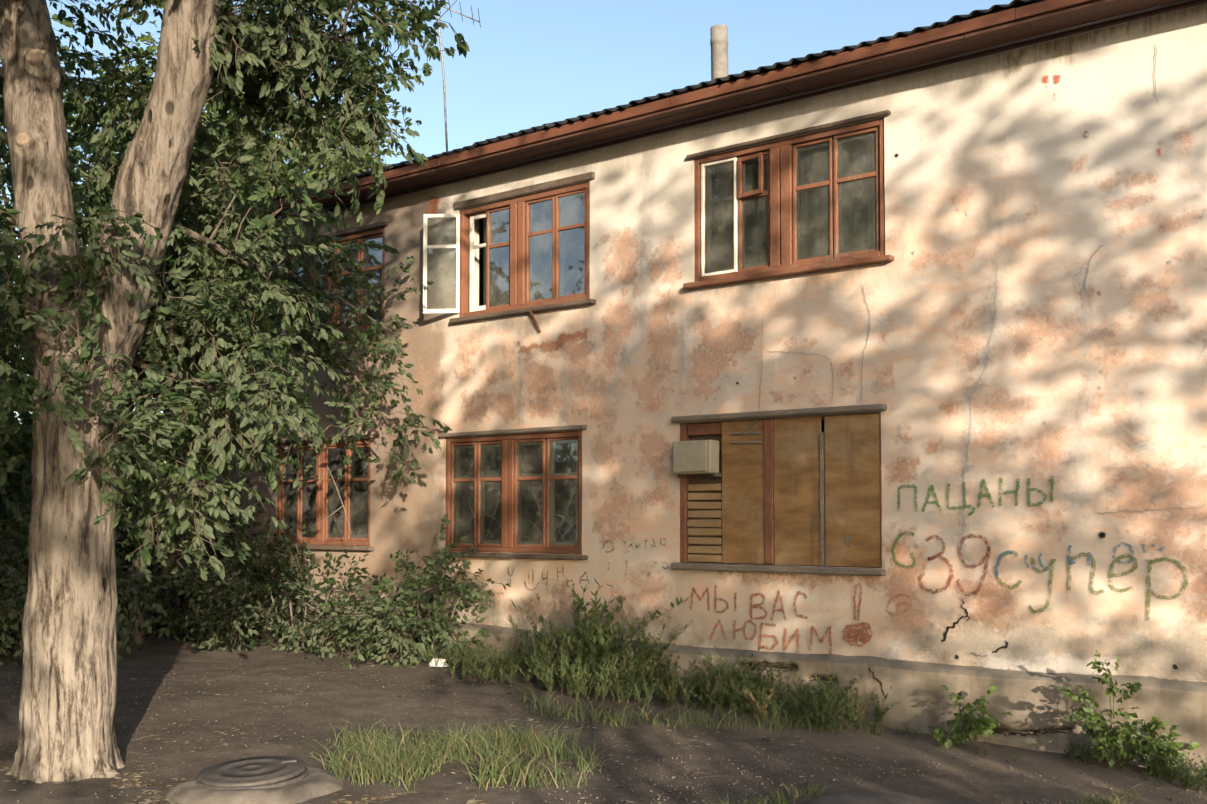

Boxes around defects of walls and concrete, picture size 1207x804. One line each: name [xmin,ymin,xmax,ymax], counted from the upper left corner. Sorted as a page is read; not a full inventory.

peeling [596,231,755,399]
crack [759,282,870,408]
crack [962,266,998,567]
crack [939,599,1034,657]